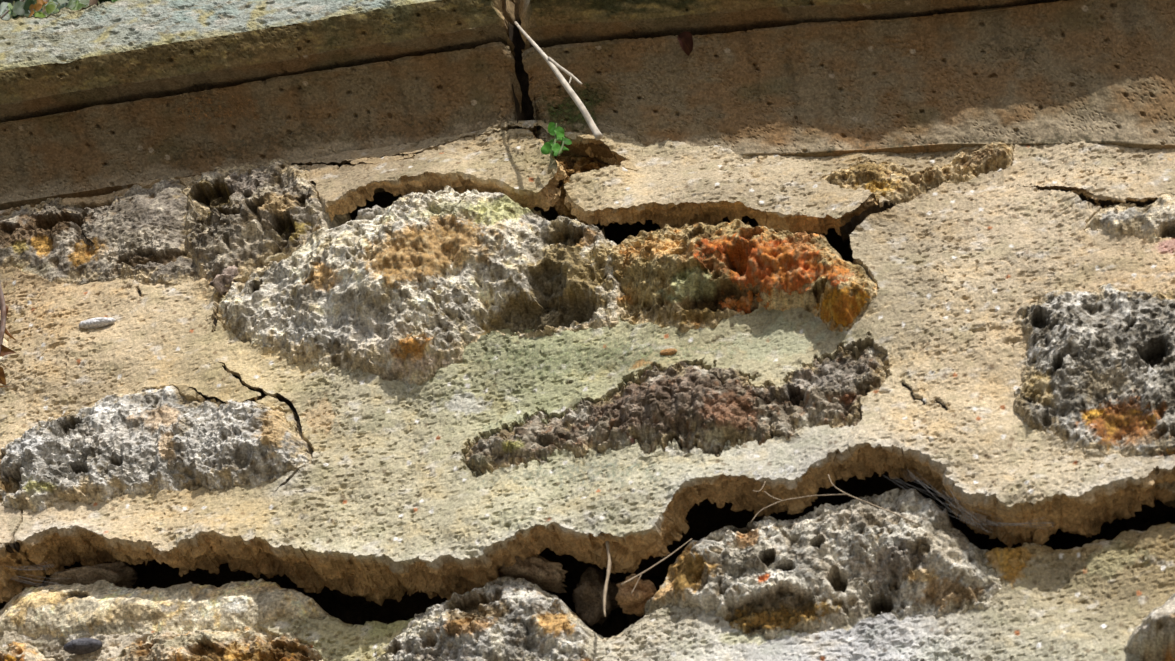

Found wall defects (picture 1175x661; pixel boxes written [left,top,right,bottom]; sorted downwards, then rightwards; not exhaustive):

crack [506,0,539,137]
crack [1038,189,1155,208]
crack [81,228,94,246]
peeling [209,265,241,297]
flaking render [183,360,262,404]
crack [194,365,310,454]
flaking render [0,422,1175,626]
crack [923,494,1175,551]
crack [5,542,20,553]
crack [201,580,230,588]
crack [266,579,426,625]
crack [544,494,881,638]